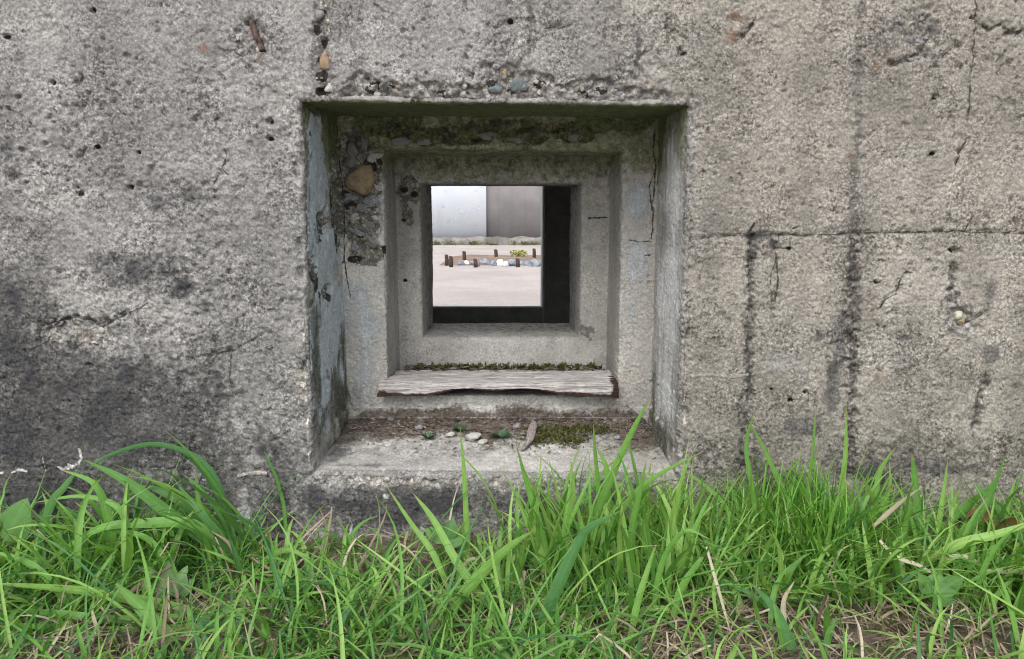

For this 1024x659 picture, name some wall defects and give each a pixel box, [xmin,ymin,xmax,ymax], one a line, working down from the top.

rust [249,19,266,52]
leakage [301,103,339,170]
peeling [294,113,595,462]
crack [624,132,657,256]
leakage [747,232,777,262]
crack [889,0,1022,166]